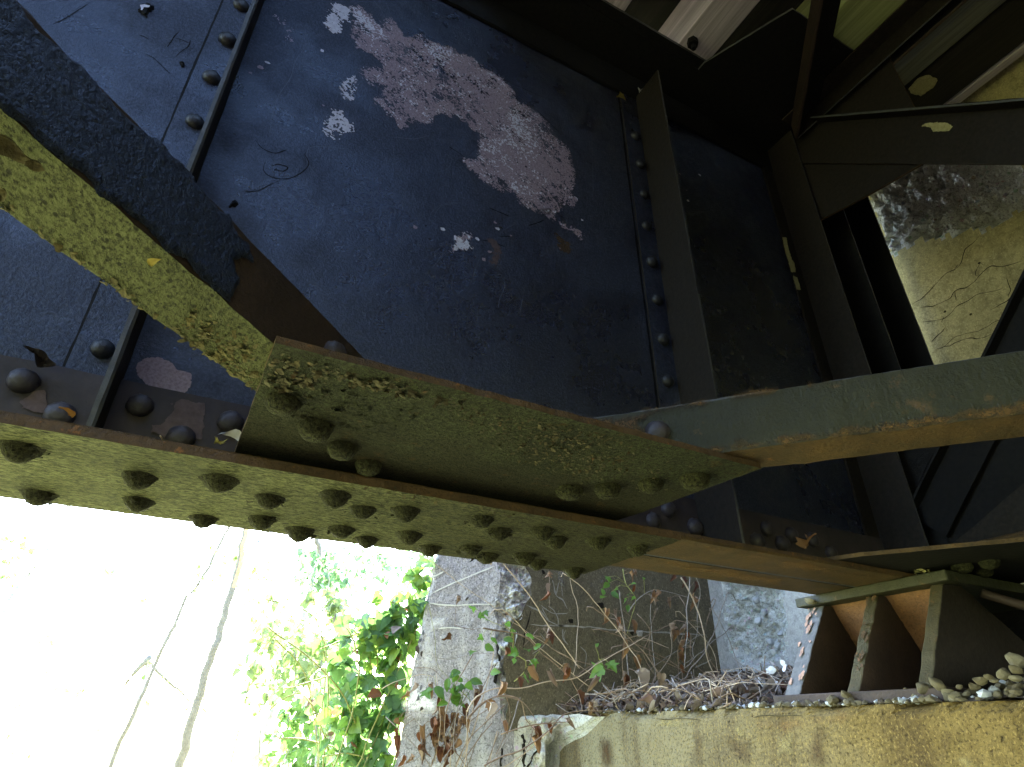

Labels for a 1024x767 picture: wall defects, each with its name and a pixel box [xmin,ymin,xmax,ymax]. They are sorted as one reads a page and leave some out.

peeling [322,2,585,254]
spalling [870,165,1024,257]
crack [914,236,1023,352]
peeling [136,357,205,439]